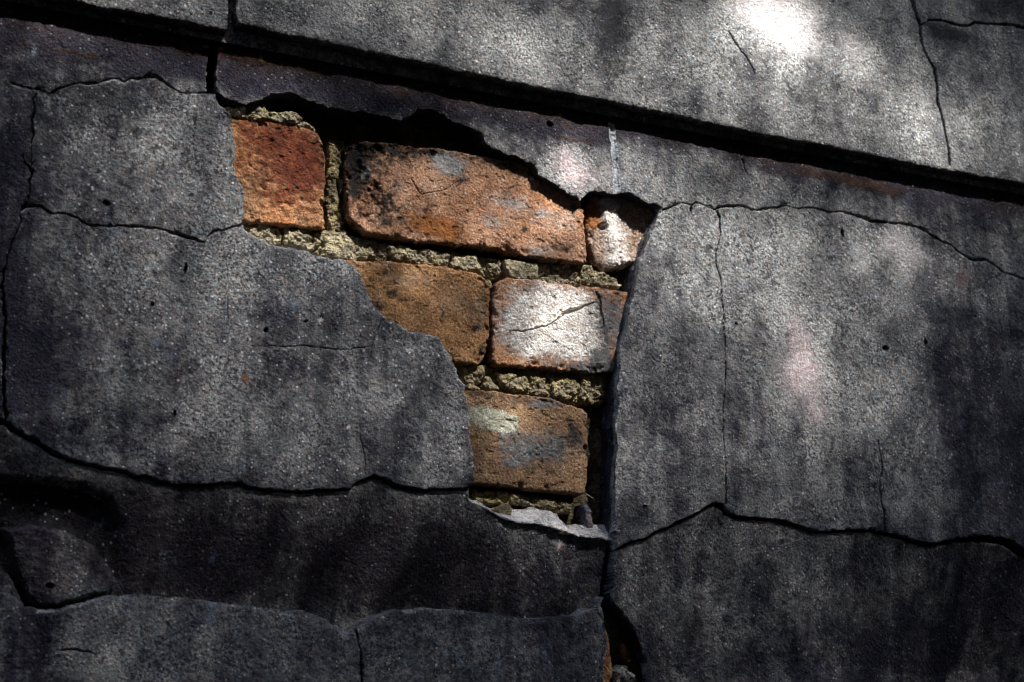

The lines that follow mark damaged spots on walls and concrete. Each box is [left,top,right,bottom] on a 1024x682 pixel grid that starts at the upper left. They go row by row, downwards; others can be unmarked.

crack [0,89,469,494]
flaking render [215,91,662,543]
flaking render [597,586,650,682]
crack [600,465,1024,588]